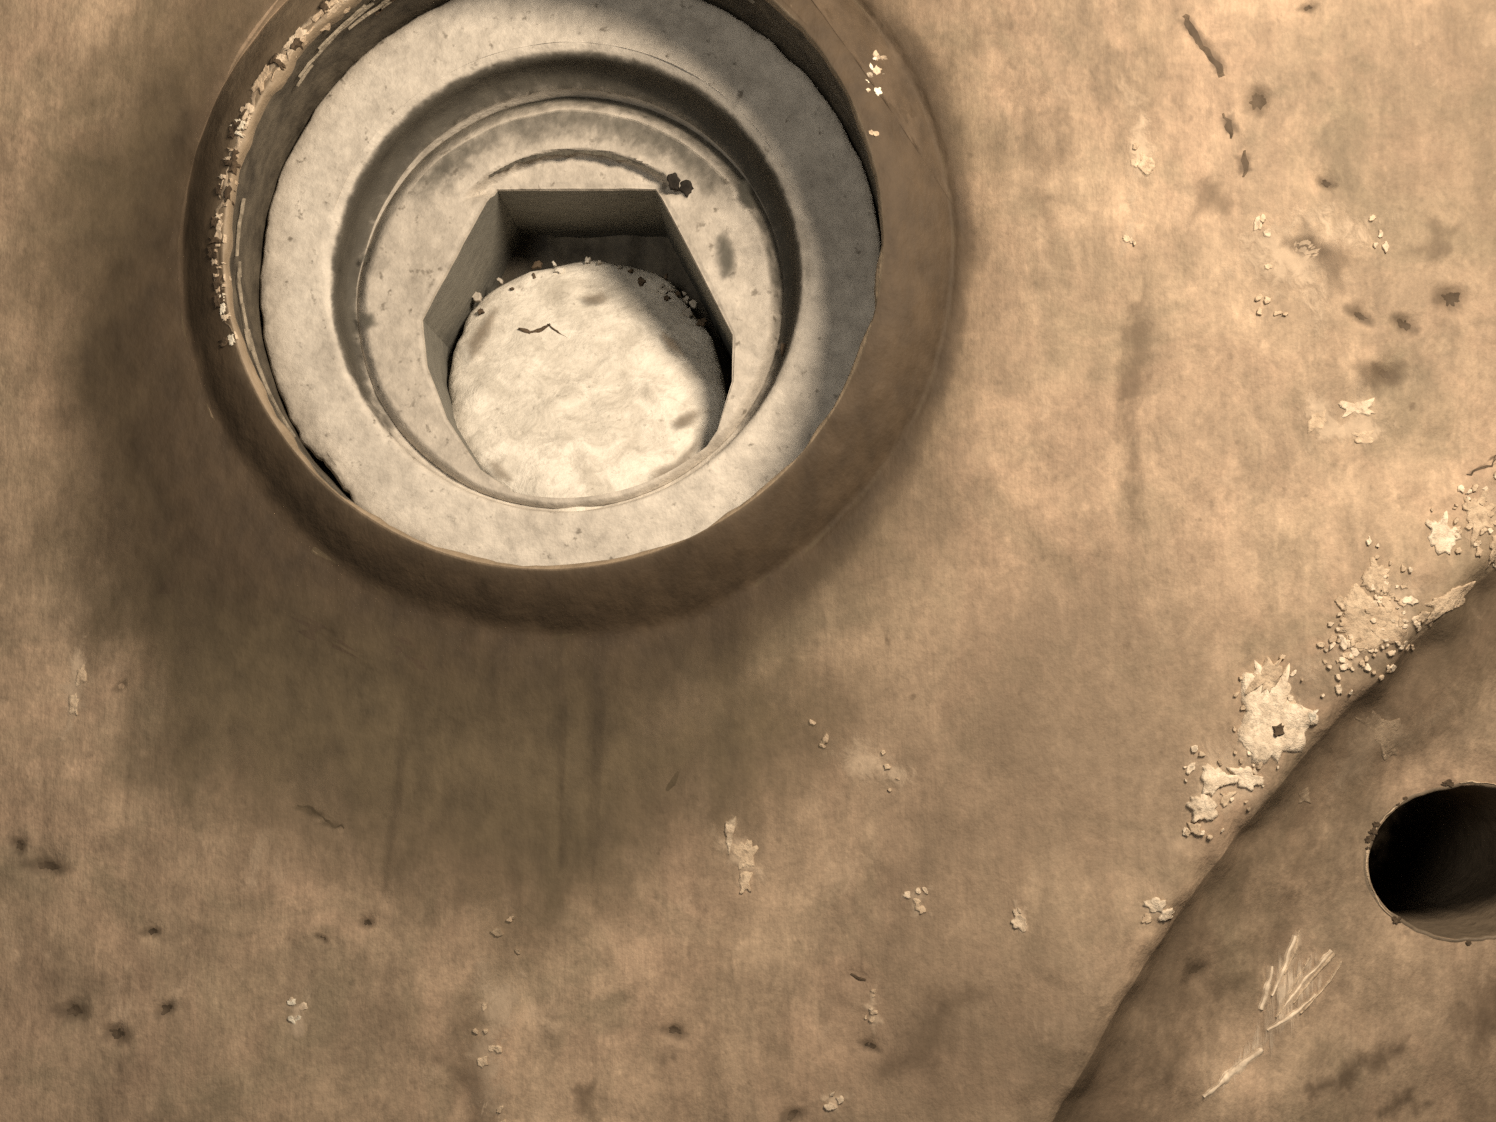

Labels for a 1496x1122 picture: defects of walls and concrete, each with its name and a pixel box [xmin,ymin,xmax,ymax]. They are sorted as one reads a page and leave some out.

damp [68,0,968,914]
spalling [1182,471,1496,840]
peeling [1364,796,1408,924]